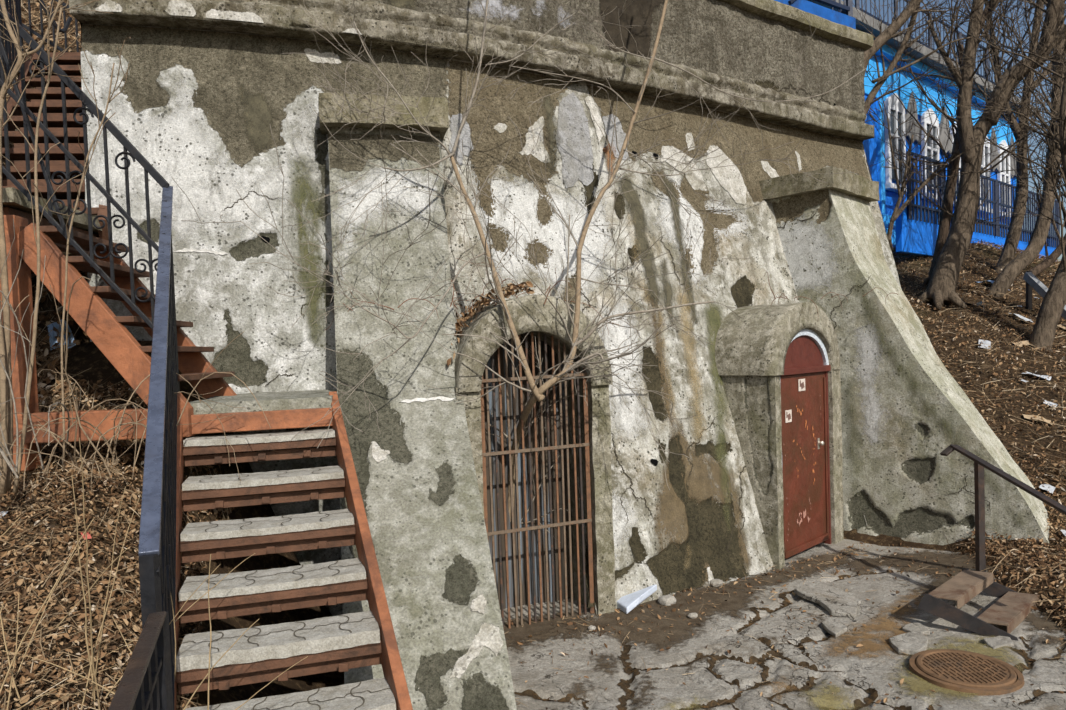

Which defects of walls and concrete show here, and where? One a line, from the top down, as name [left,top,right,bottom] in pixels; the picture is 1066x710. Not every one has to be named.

flaking render [82,0,870,277]
water stain [292,160,322,341]
flaking render [321,260,334,307]
water stain [620,176,750,567]
flaking render [336,349,413,516]
flaking render [414,554,509,710]
crack [514,689,589,710]
crack [616,590,934,710]
crack [835,566,922,581]
flaking render [847,490,975,538]
flaking render [901,456,937,484]
crack [986,636,1066,705]